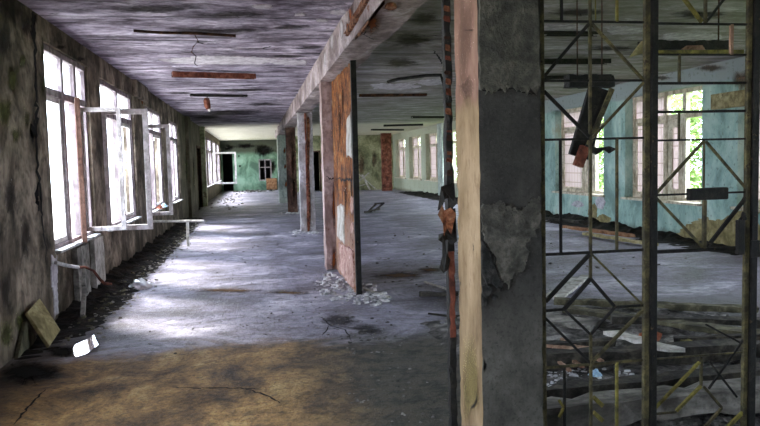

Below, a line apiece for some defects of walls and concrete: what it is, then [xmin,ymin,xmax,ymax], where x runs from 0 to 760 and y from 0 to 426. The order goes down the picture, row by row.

crack [30,11,47,262]
peeling [337,196,355,287]
spalling [481,196,542,307]
spalling [677,211,742,246]
crack [14,389,46,424]
crack [177,387,280,403]